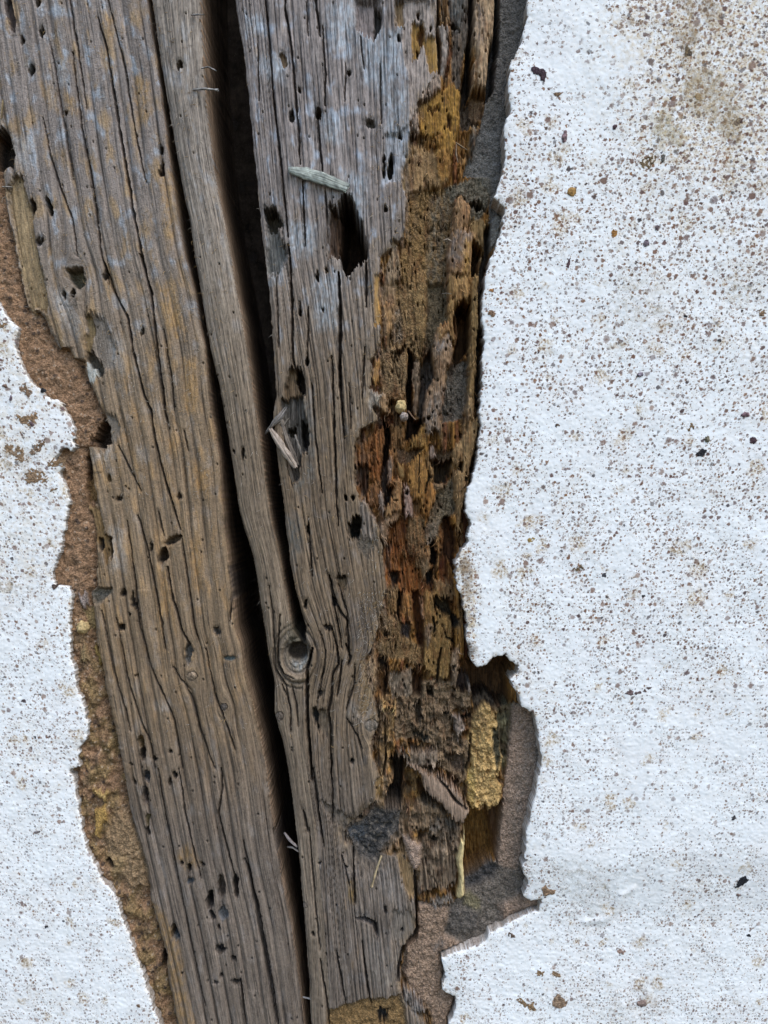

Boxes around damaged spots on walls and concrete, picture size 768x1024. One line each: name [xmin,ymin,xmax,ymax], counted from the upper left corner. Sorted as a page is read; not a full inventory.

spalling [462,0,526,257]
spalling [335,196,368,277]
spalling [452,301,473,366]
spalling [405,420,424,441]
spalling [349,514,362,540]
spalling [0,128,177,1024]
spalling [425,540,451,617]
spalling [384,751,406,810]
spalling [401,655,556,1024]